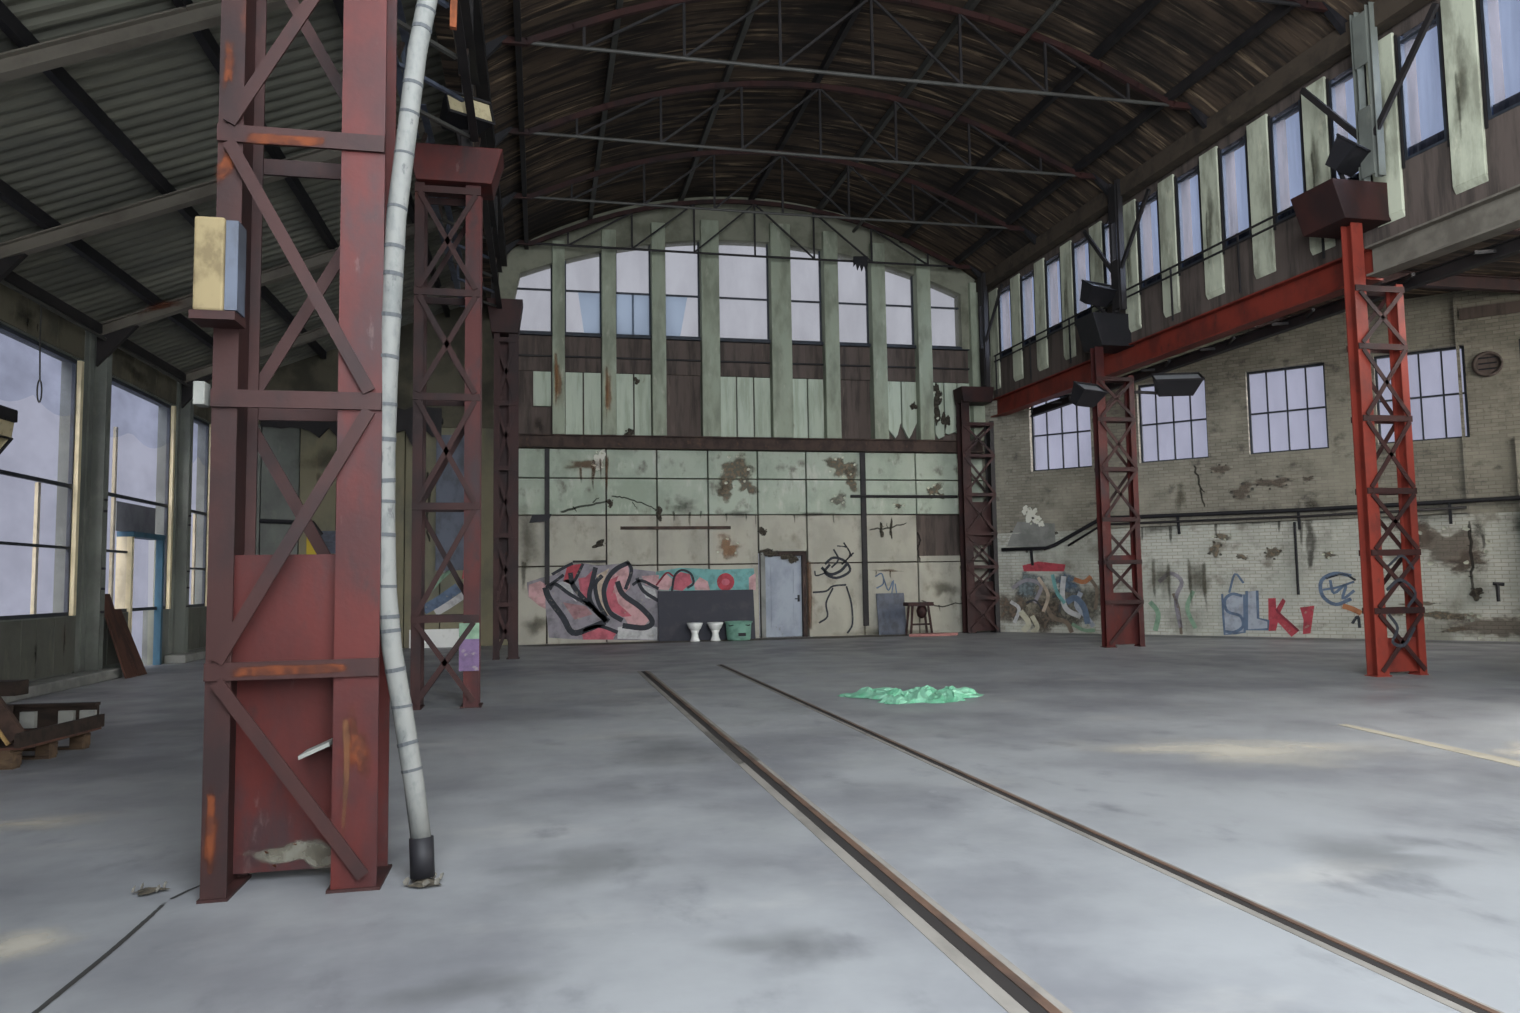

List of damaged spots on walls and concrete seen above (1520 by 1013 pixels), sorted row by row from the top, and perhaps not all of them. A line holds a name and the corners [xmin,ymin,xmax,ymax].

peeling [718,453,758,502]
peeling [825,456,857,505]
peeling [1418,521,1520,642]
rust [234,664,346,676]
rust [205,795,217,867]